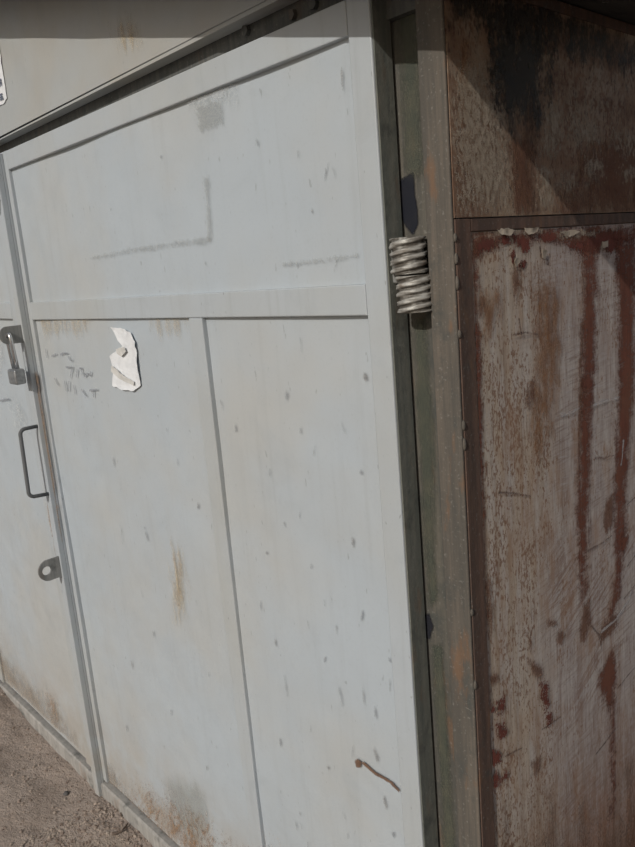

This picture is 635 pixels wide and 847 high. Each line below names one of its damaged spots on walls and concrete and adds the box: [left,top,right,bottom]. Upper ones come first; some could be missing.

damp [448,0,635,143]
peeling [495,227,543,236]
peeling [555,227,595,240]
corrosion [472,225,635,645]
corrosion [598,652,617,818]